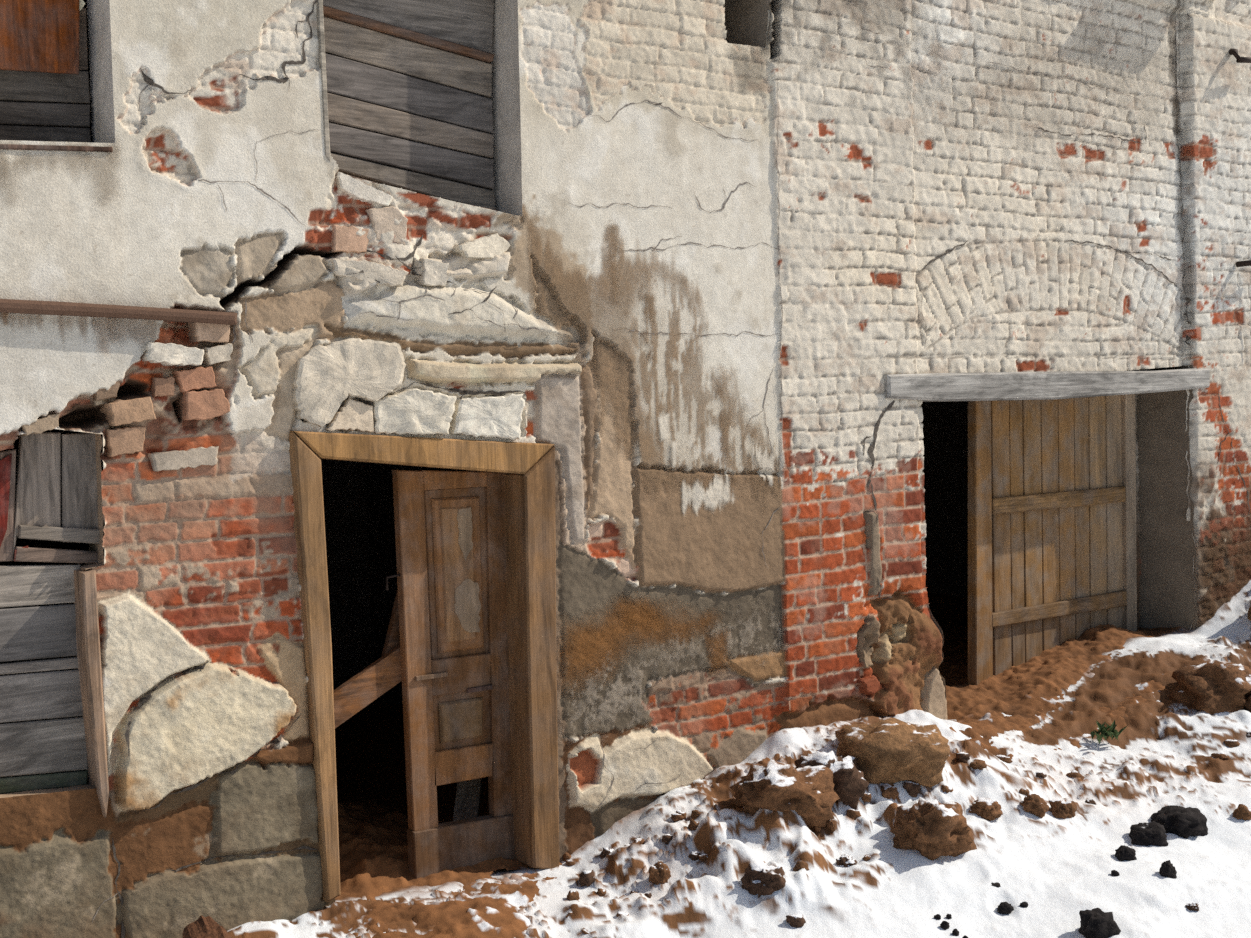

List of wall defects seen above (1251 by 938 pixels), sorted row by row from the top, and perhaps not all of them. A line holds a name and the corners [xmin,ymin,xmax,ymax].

crack [138,68,192,111]
flaking render [118,0,320,186]
crack [238,0,318,86]
flaking render [520,0,775,130]
crack [190,130,547,368]
leakage [523,209,785,513]
crack [569,0,784,569]
spalling [0,172,524,823]
crack [863,400,895,523]
spalling [1209,395,1251,540]
flaking render [556,461,874,811]